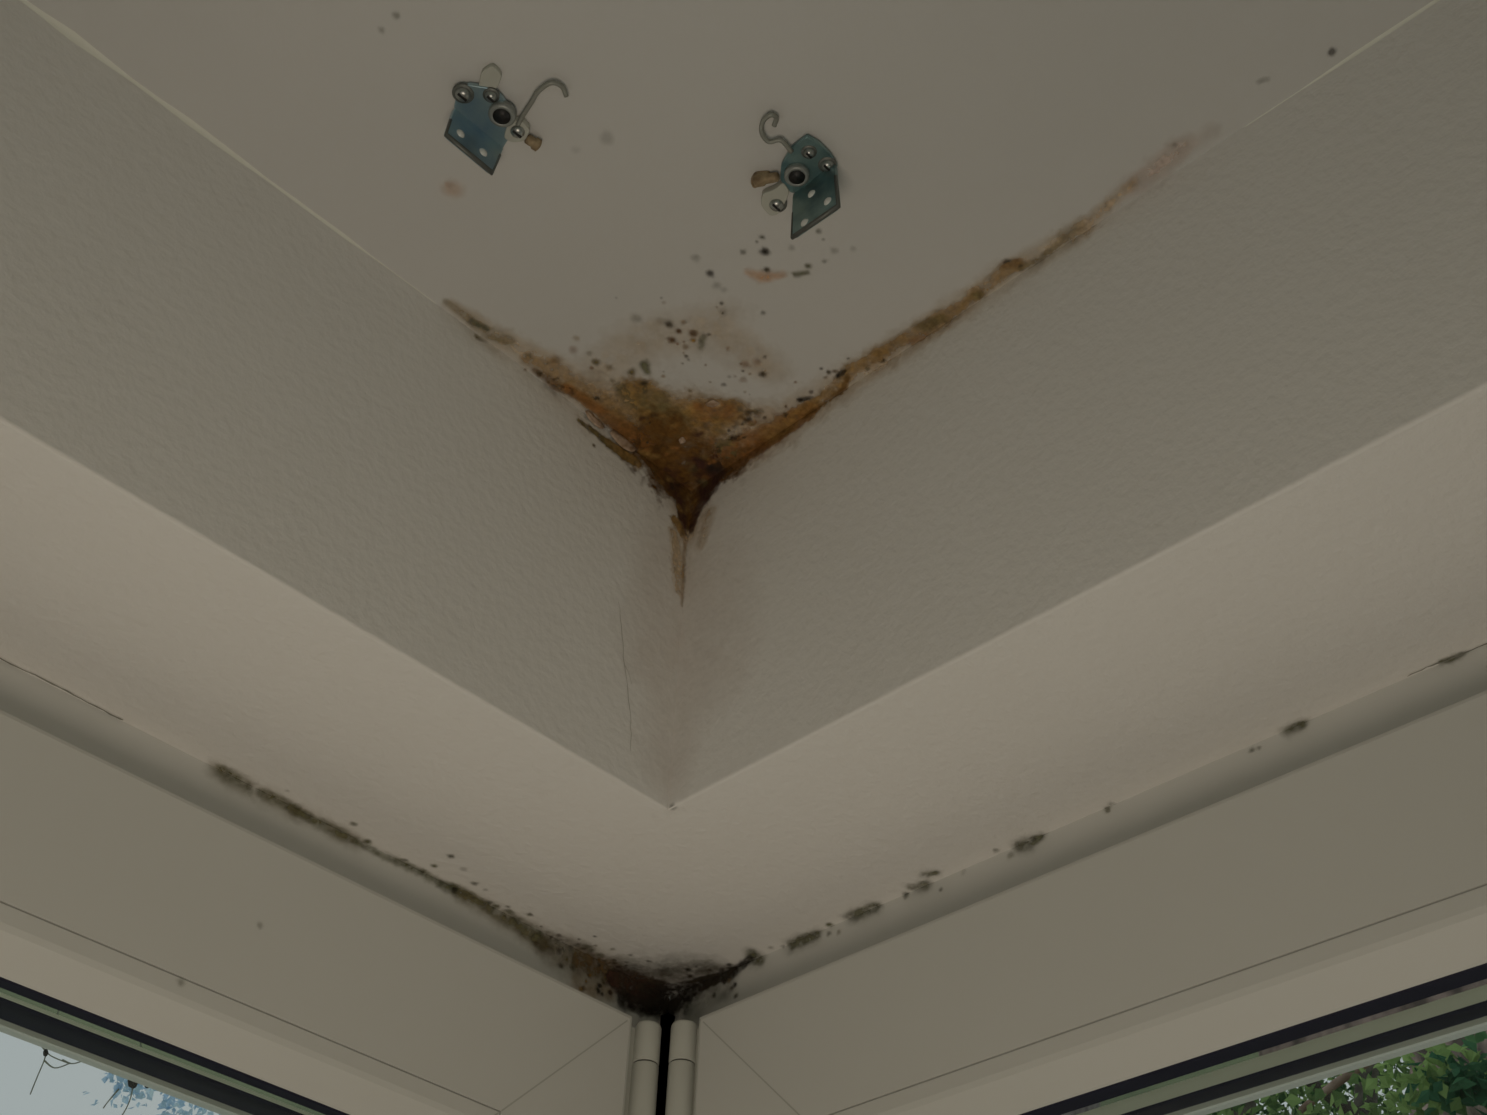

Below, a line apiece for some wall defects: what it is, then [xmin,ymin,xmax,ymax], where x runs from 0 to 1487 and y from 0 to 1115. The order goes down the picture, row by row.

damp [1286,721,1306,732]
damp [1016,835,1044,850]
damp [217,766,764,1018]
damp [905,871,939,897]
damp [848,903,880,918]
damp [789,923,832,950]